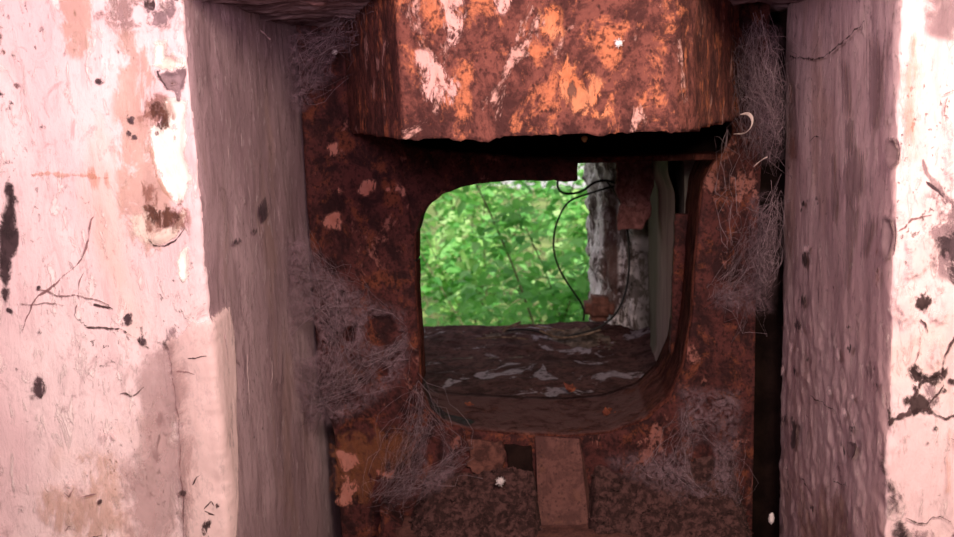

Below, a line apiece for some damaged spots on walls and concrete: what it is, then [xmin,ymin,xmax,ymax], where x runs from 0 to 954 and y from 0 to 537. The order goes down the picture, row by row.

corrosion [539,5,563,40]
crack [790,21,864,60]
corrosion [553,56,613,118]
spalling [130,40,192,282]
corrosion [615,161,654,231]
water stain [0,183,19,313]
crack [22,217,149,348]
crack [887,319,954,440]
water stain [880,454,934,537]